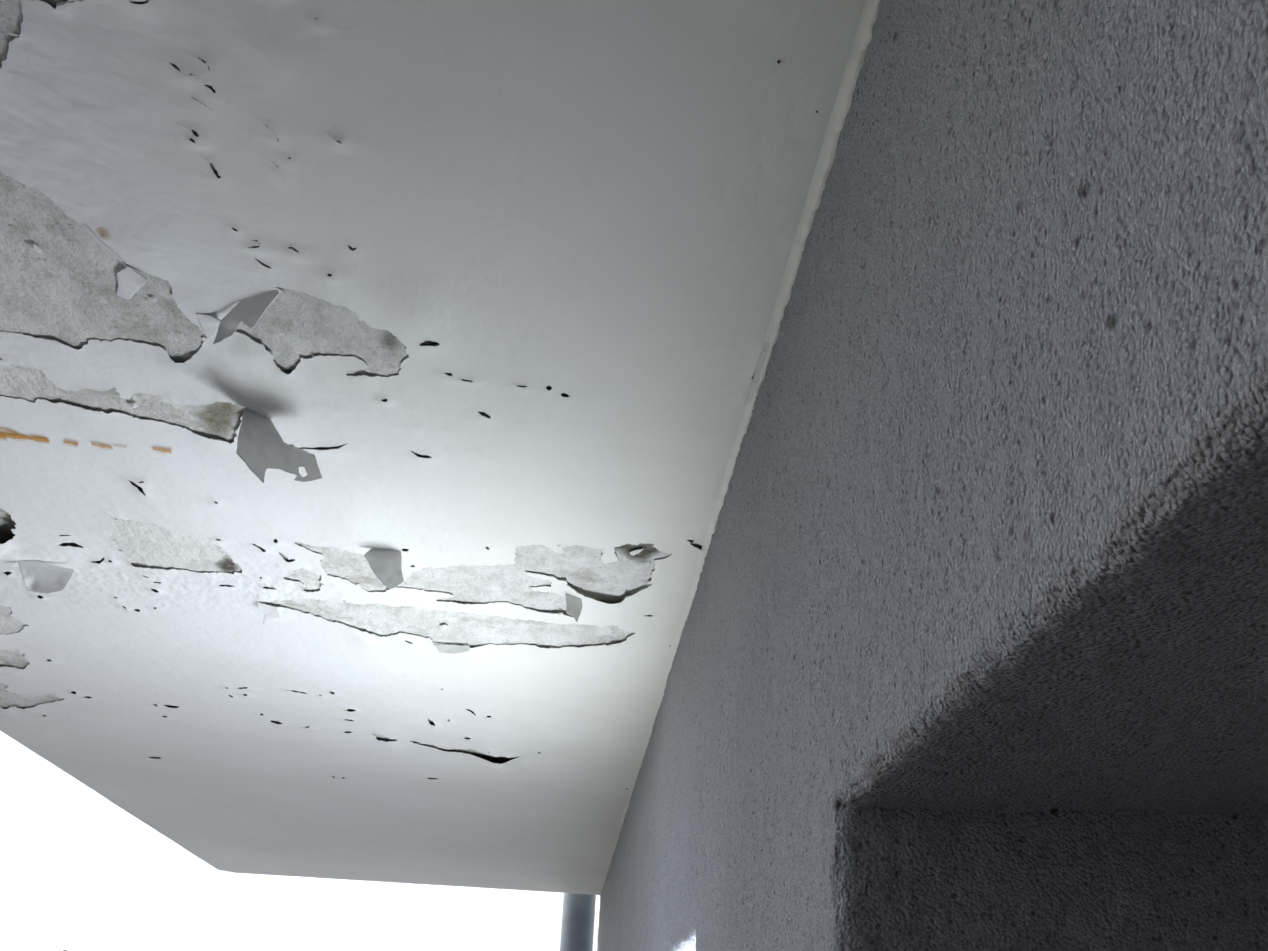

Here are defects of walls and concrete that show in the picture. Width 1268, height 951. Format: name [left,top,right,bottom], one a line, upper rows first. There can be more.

peeling [0,0,137,97]
peeling [0,161,429,385]
rust [0,428,49,443]
peeling [0,352,255,451]
flaking render [90,503,706,654]
peeling [0,564,105,718]
crack [215,683,550,781]